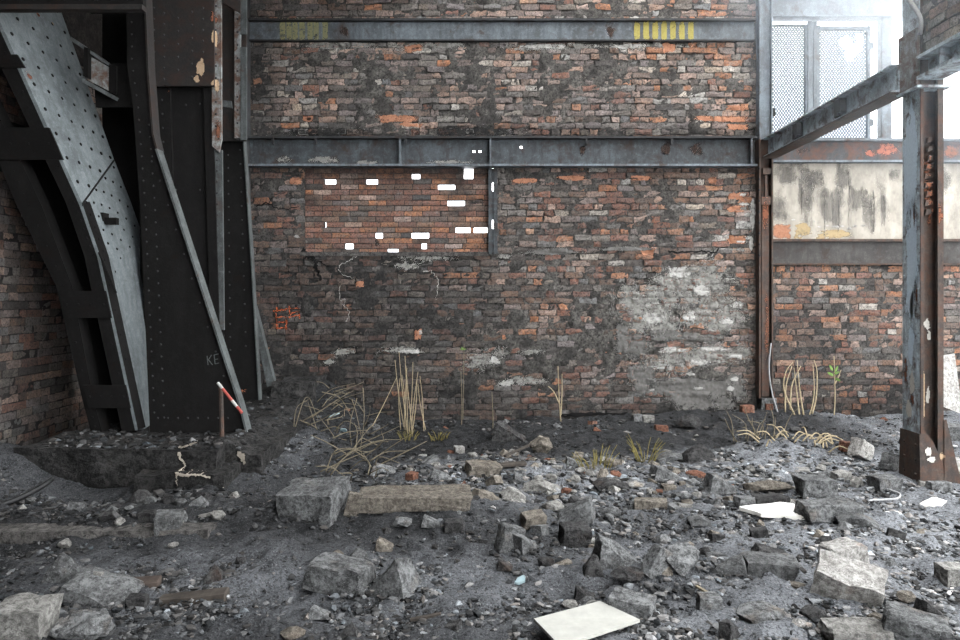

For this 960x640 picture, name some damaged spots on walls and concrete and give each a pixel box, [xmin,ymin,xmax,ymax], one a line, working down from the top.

peeling [194,58,204,82]
water stain [777,163,886,236]
rust [924,157,943,224]
peeling [866,96,931,417]
water stain [613,260,753,376]